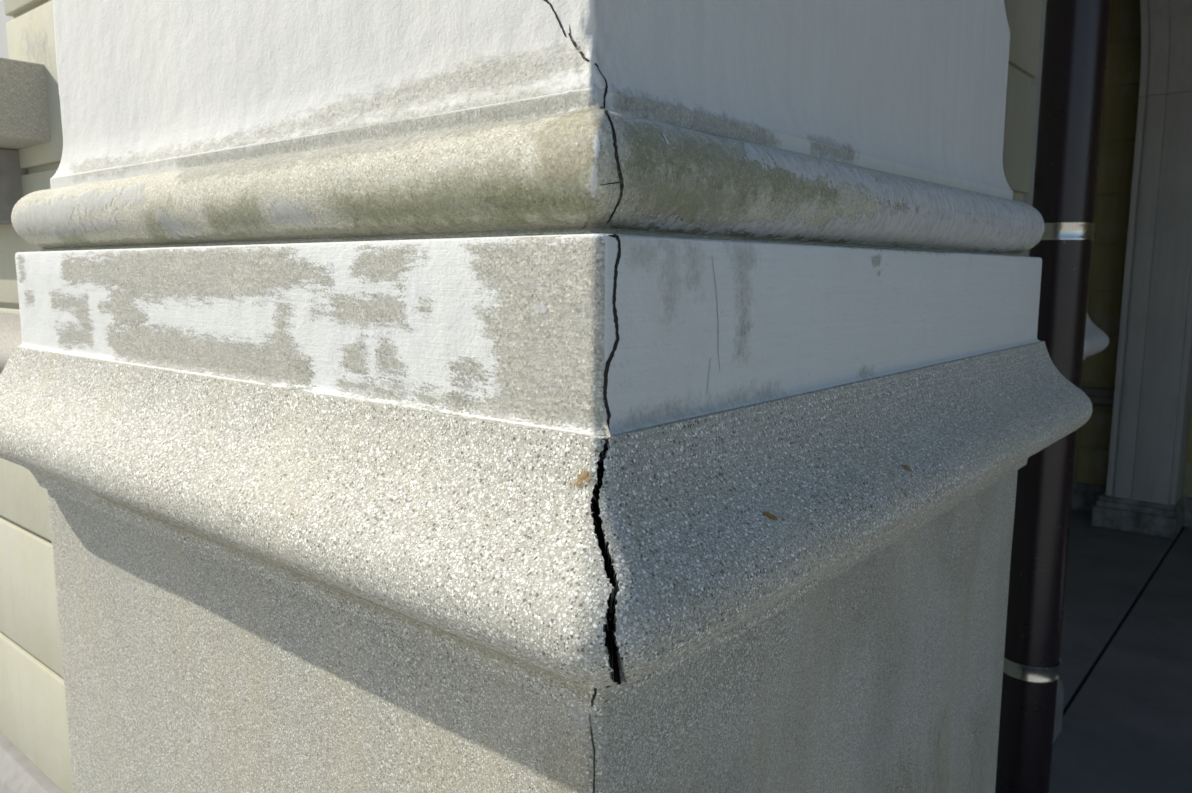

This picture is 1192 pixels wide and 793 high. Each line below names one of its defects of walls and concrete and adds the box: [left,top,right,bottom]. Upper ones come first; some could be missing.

leakage [177,86,598,181]
leakage [615,93,836,200]
peeling [16,252,34,307]
peeling [51,234,611,439]
crack [543,0,627,793]